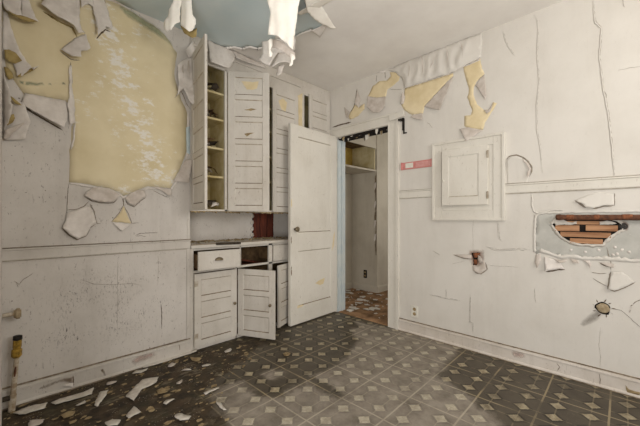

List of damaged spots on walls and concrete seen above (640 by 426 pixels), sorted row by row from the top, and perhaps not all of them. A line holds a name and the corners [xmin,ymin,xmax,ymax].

peeling [2,0,336,240]
crack [535,18,543,165]
crack [593,0,615,176]
flaking render [453,252,488,274]
flaking render [533,210,640,292]